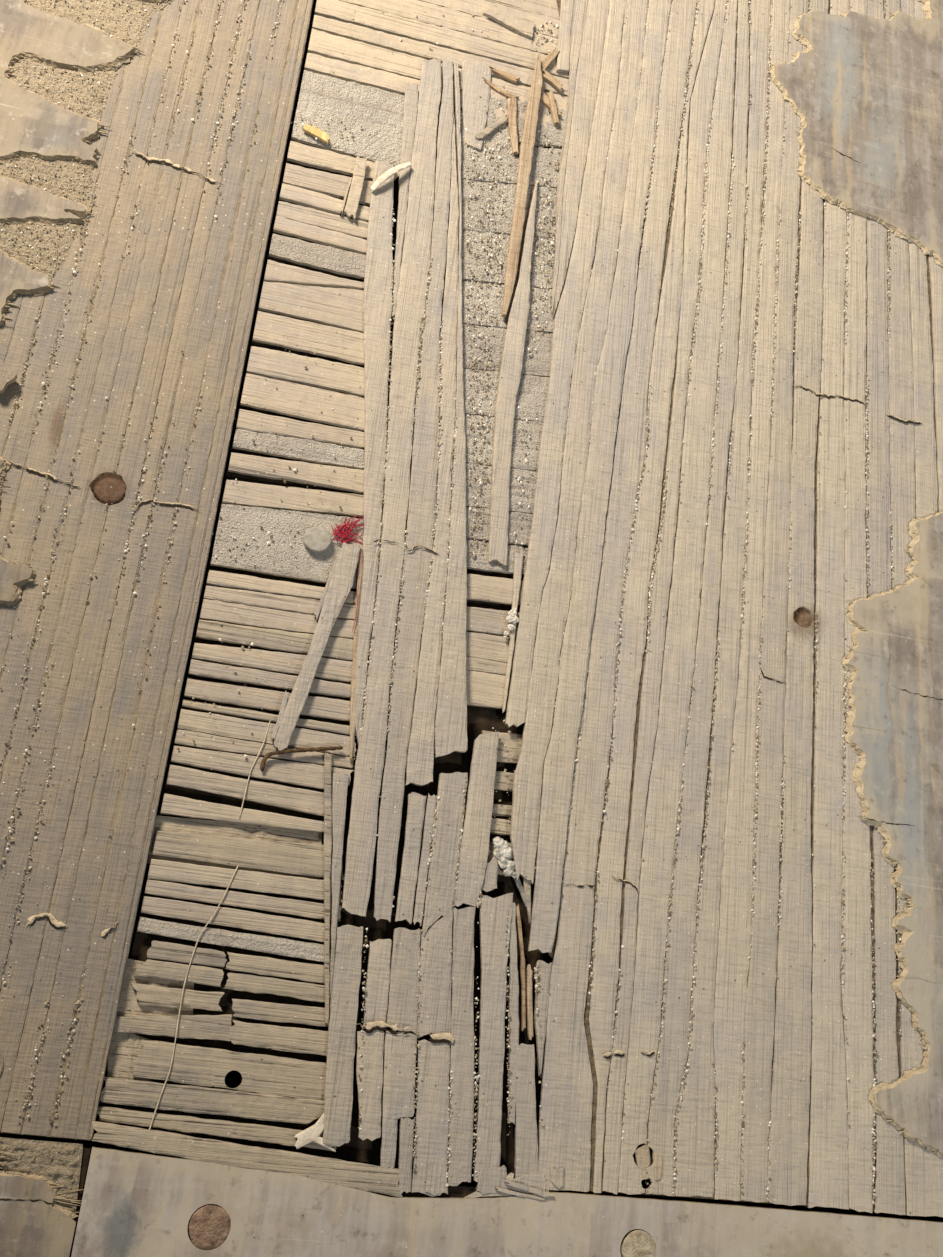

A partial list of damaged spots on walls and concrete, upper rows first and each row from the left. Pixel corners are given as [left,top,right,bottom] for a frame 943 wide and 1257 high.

crack [793,385,923,424]
crack [366,540,437,554]
peeling [0,0,314,1220]
peeling [323,0,943,1217]
crack [761,667,786,684]
crack [566,876,639,894]
crack [363,1021,455,1045]
crack [602,1049,654,1059]